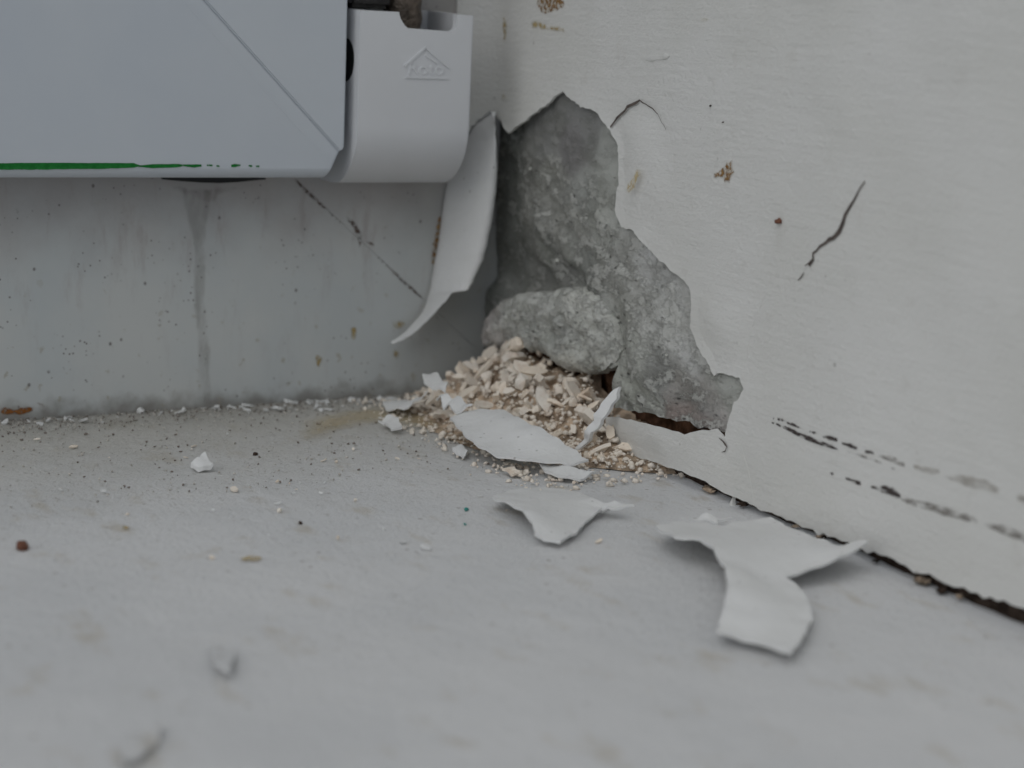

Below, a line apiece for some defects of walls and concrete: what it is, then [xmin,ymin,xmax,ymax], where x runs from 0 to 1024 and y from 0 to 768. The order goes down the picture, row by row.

crack [610,99,666,129]
rust [714,165,734,181]
crack [798,181,865,280]
spalling [391,93,754,503]
rust [1,407,32,415]
crack [674,469,1024,623]